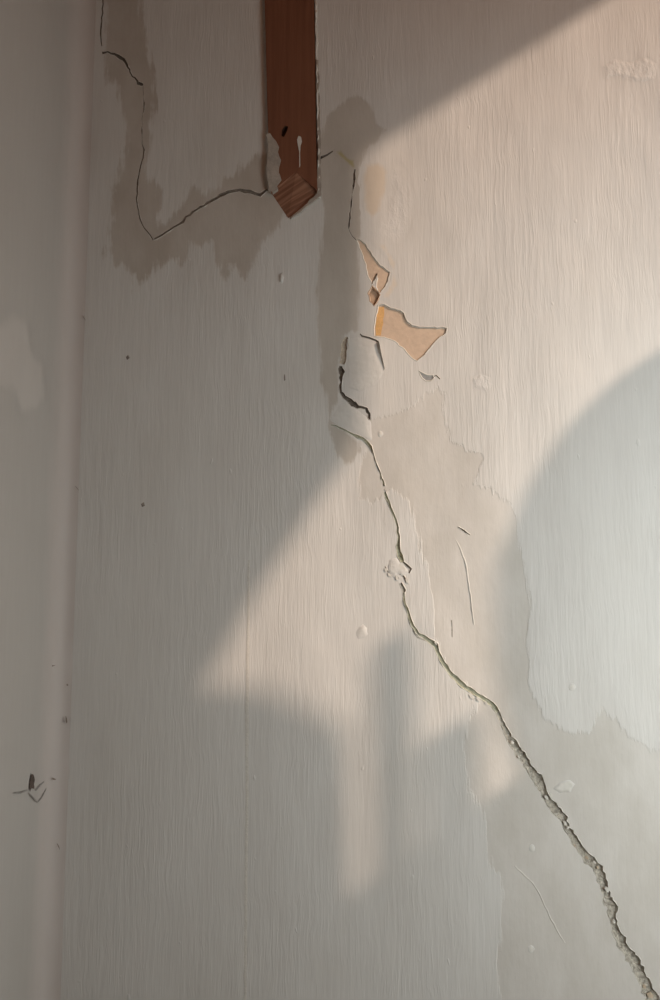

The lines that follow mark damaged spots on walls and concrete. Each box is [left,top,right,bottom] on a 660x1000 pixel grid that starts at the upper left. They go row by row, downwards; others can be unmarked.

crack [99,0,268,241]
leakage [96,0,291,299]
flaking render [356,238,448,382]
crack [331,333,660,1000]